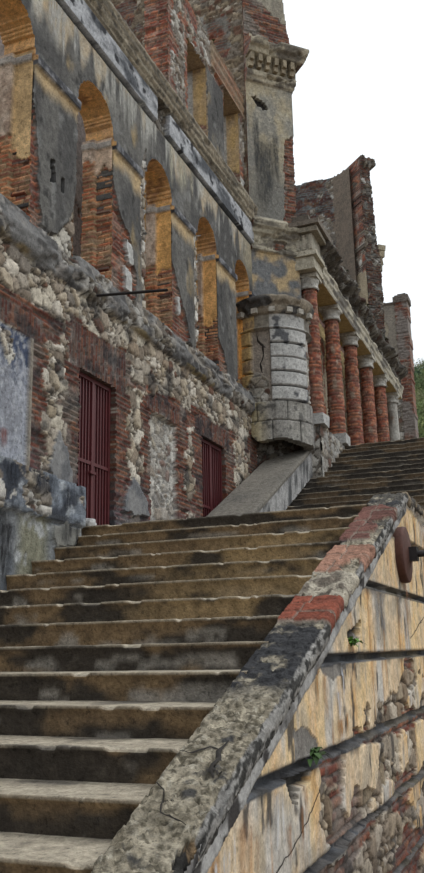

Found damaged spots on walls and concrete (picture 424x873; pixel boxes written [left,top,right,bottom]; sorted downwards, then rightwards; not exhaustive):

damp [254,122,279,198]
spalling [169,232,201,352]
spalling [0,325,15,364]
crack [257,337,266,373]
flaking render [49,431,73,482]
flaking render [121,478,150,516]
damp [0,512,12,574]
spalling [347,619,361,646]
crack [180,740,229,778]
spalling [281,657,424,873]
crack [156,782,186,825]
crack [276,790,320,873]